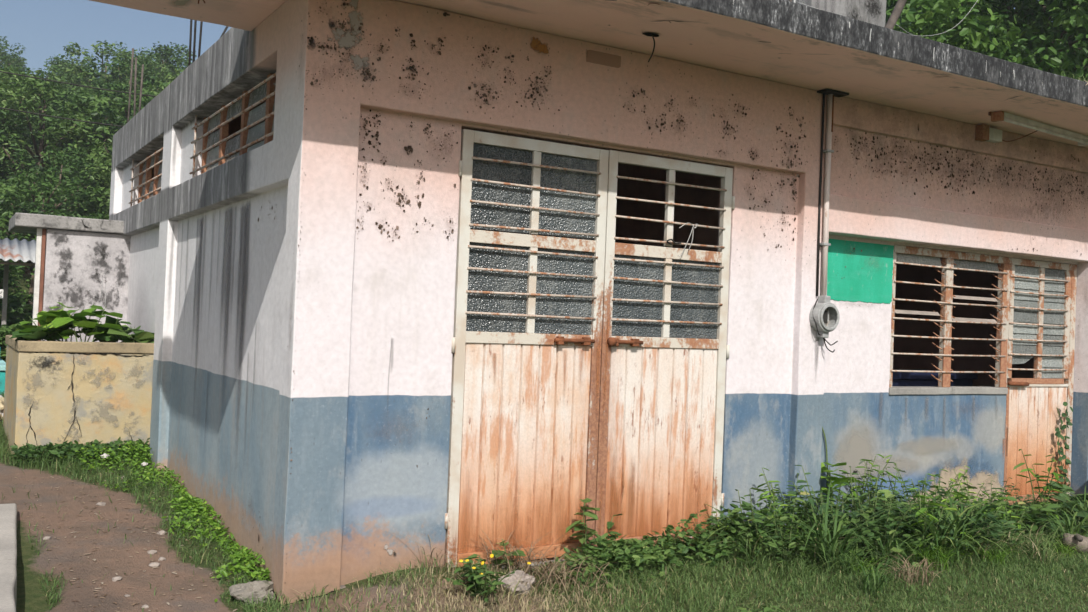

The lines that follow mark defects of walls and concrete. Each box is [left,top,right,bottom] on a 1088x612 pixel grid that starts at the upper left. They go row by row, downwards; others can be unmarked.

water stain [849,0,881,39]
water stain [48,233,128,311]
crack [28,352,149,440]
peeling [840,435,872,478]
peeling [908,461,1006,508]